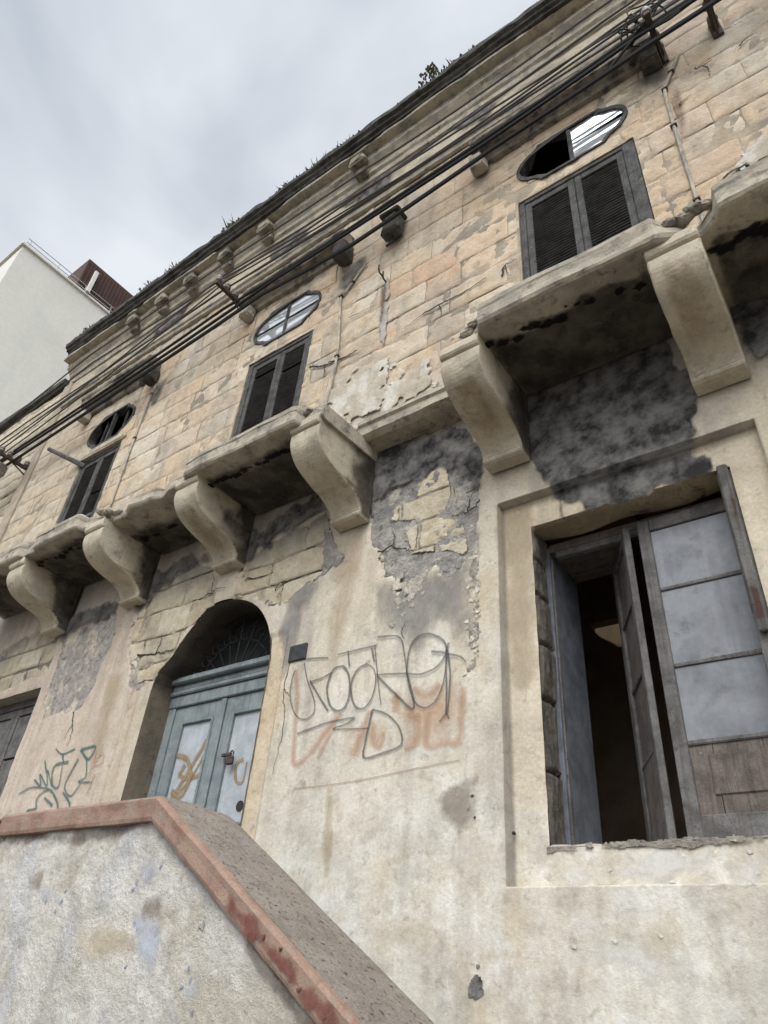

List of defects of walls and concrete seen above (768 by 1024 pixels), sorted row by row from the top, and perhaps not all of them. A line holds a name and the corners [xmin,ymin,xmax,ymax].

flaking render [302,357,439,430]
flaking render [370,464,482,677]
flaking render [0,612,117,722]
water stain [443,783,476,826]
flaking render [468,964,484,999]